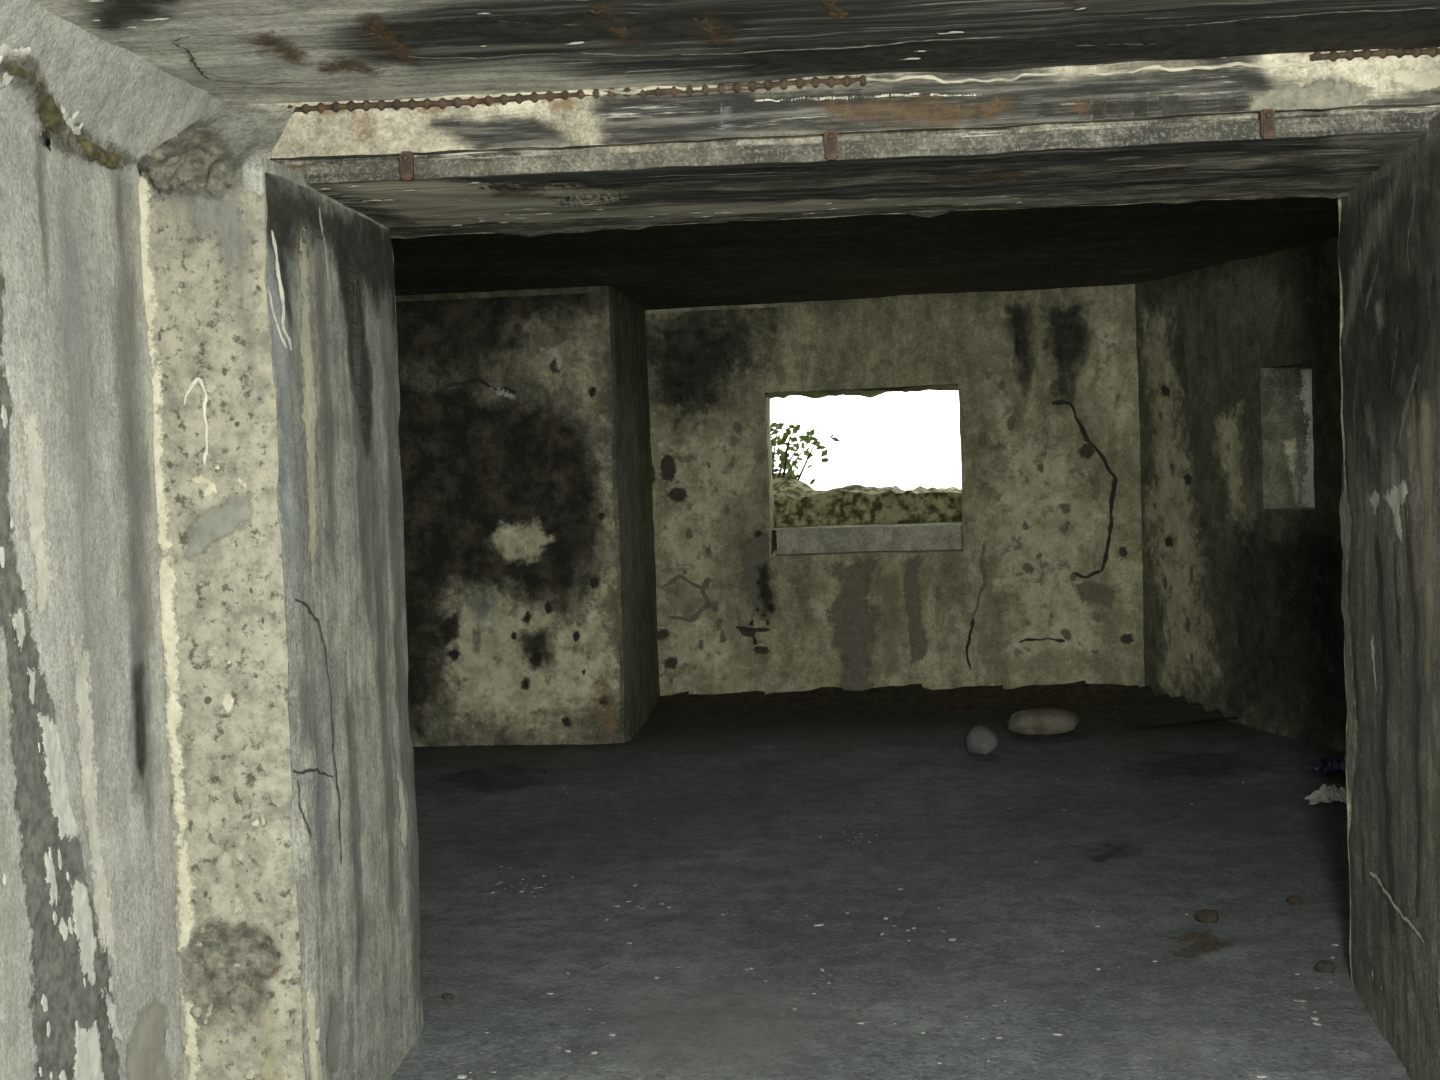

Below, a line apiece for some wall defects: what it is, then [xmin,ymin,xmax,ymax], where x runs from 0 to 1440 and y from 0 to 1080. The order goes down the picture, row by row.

spalling [0,43,324,1080]
crack [1051,399,1118,605]
leakage [1283,368,1315,507]